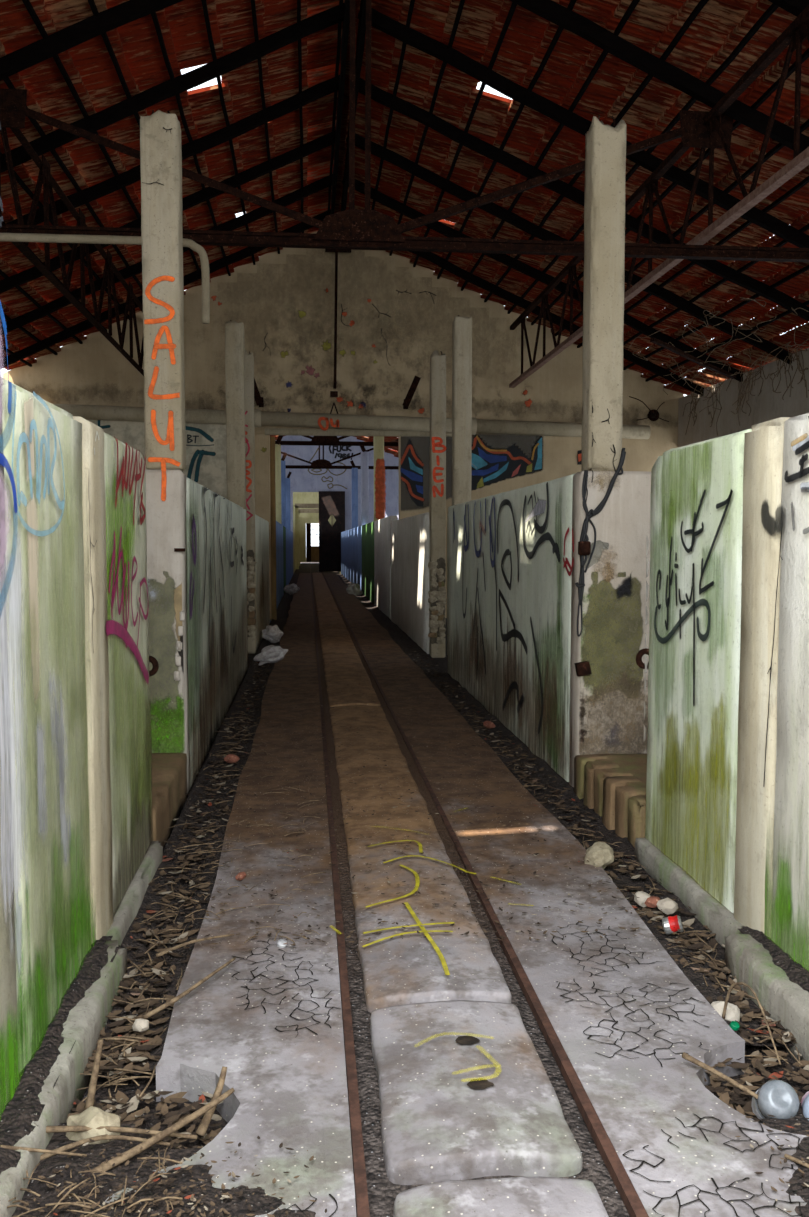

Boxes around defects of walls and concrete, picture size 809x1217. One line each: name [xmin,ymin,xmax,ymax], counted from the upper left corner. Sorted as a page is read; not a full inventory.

flaking render [147,571,185,753]
flaking render [581,537,649,741]
crack [230,932,341,1035]
crack [552,920,708,1067]
crack [622,1114,809,1217]